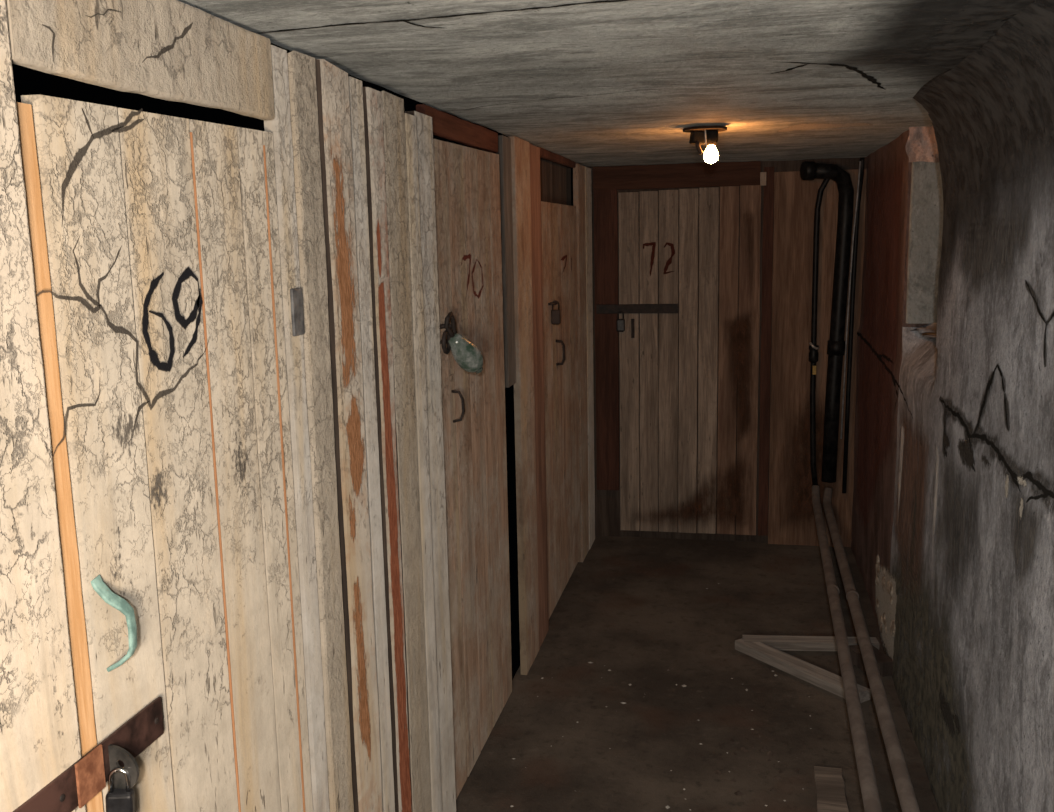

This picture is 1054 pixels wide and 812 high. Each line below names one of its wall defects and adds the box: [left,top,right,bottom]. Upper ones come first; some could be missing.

crack [42,24,55,57]
crack [142,22,193,63]
crack [706,62,886,90]
crack [37,108,210,444]
crack [1025,280,1054,367]
crack [52,377,100,458]
crack [939,364,1054,513]